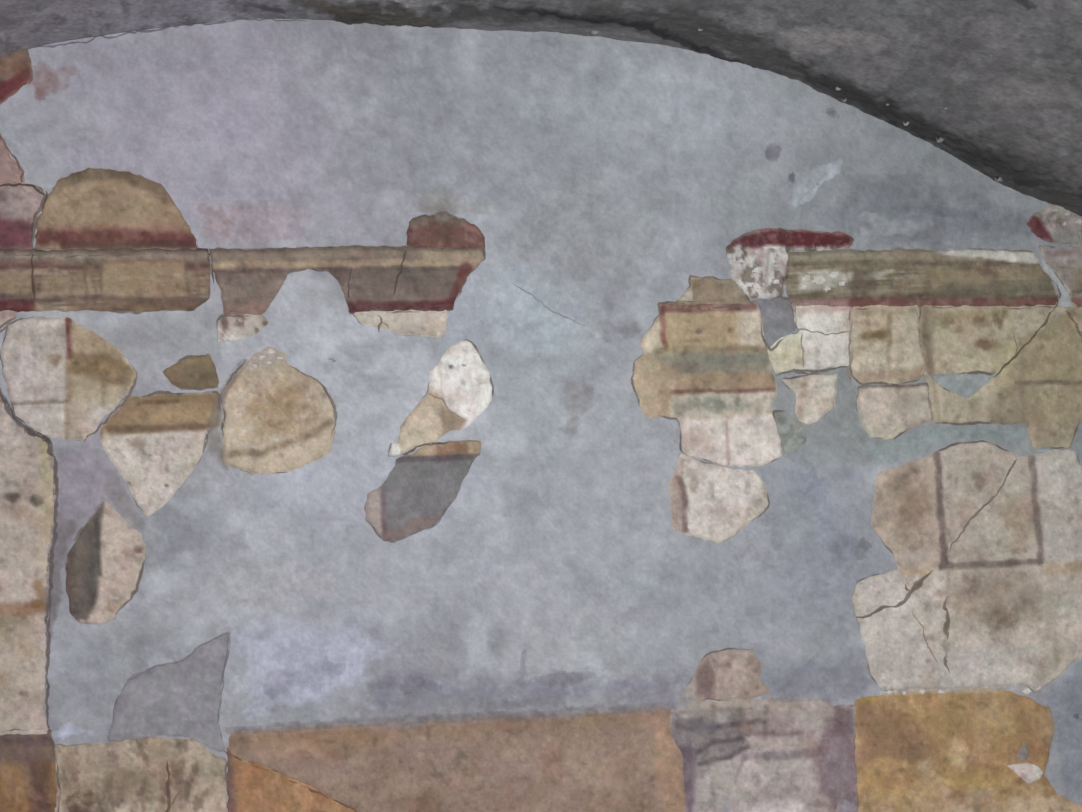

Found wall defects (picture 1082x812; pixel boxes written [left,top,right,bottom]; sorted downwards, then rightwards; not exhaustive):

spalling [432,0,1082,231]
crack [0,133,48,329]
peeling [728,247,854,298]
peeling [943,250,1037,263]
flaking render [216,310,269,342]
crack [995,309,1082,377]
crack [0,388,59,731]
crack [856,459,1017,673]
crack [127,632,231,723]
spalling [880,685,1042,696]
crack [165,761,181,812]
flaking render [1008,763,1043,784]